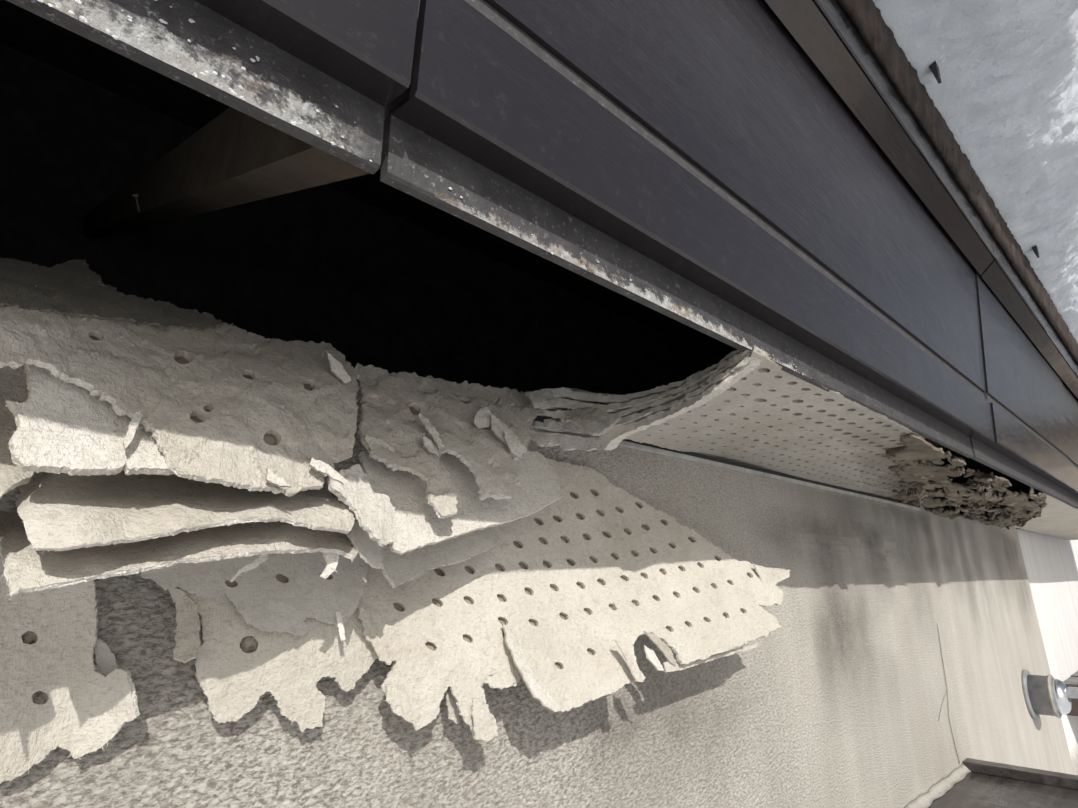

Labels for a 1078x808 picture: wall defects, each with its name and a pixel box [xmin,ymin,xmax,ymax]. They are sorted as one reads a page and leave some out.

leakage [37,0,350,152]
leakage [445,187,803,375]
peeling [123,410,143,450]
peeling [309,457,398,569]
peeling [320,553,339,579]
peeling [753,565,790,585]
peeling [168,588,201,663]
peeling [0,549,140,784]
peeling [482,673,520,690]
peeling [615,631,759,682]
peeling [385,685,421,731]
peeling [472,698,499,742]